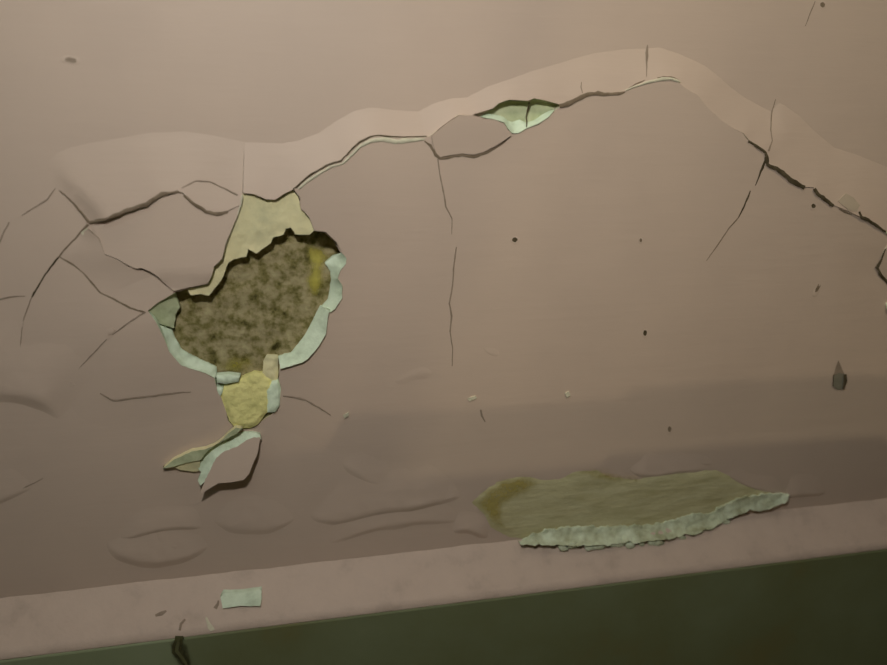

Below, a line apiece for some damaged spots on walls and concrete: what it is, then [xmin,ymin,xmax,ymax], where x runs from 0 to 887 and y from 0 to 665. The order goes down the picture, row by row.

crack [559,45,681,108]
peeling [431,99,558,157]
crack [706,99,887,283]
crack [0,180,238,367]
crack [293,135,511,366]
spalling [149,190,346,494]
crack [283,395,331,416]
spalling [472,470,789,551]
crack [172,636,187,665]